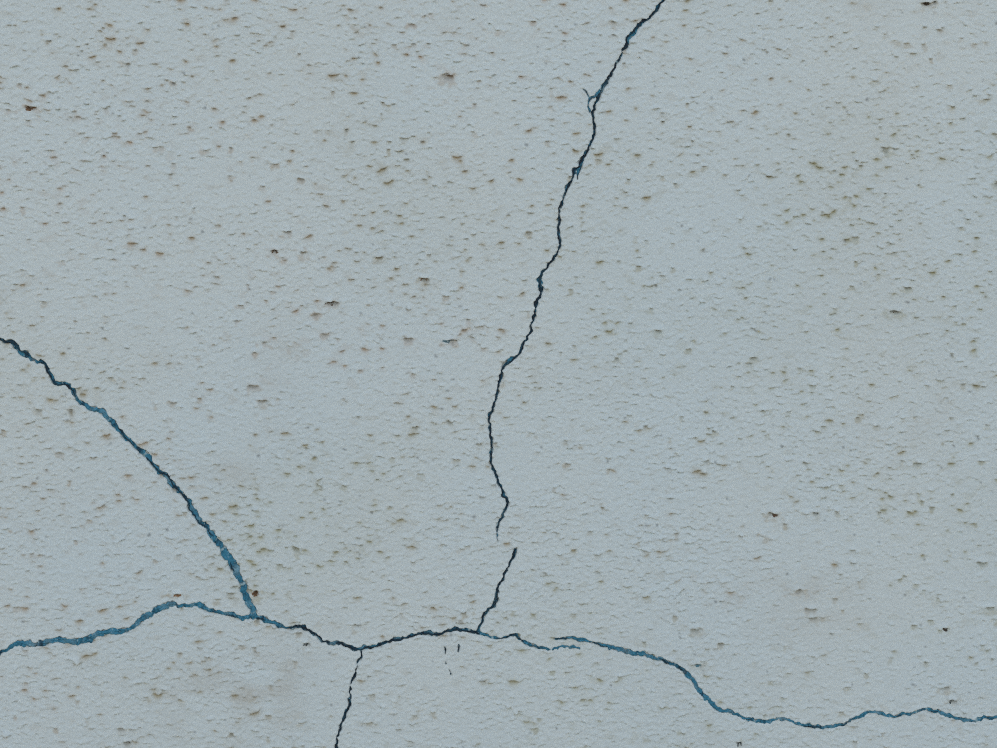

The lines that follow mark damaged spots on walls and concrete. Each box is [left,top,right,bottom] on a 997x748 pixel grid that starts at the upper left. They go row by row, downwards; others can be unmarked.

crack [488,0,665,542]
crack [0,338,997,748]